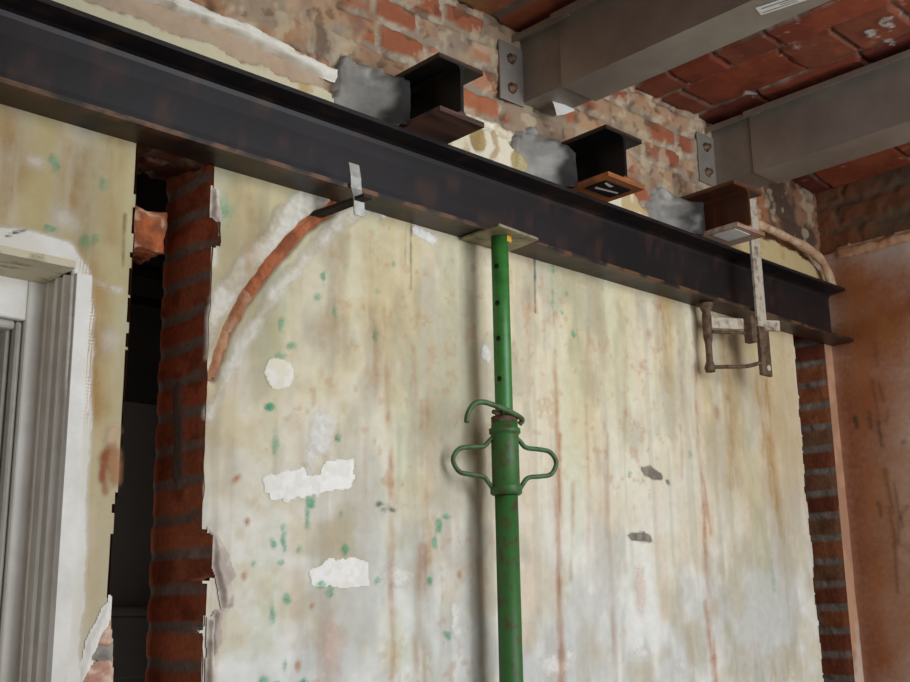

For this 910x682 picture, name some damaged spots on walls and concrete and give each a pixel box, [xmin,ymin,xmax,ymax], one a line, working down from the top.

peeling [834,229,910,259]
spalling [206,191,386,420]
peeling [262,411,355,503]
spalling [641,466,670,485]
spalling [629,532,652,542]
peeling [309,557,370,588]